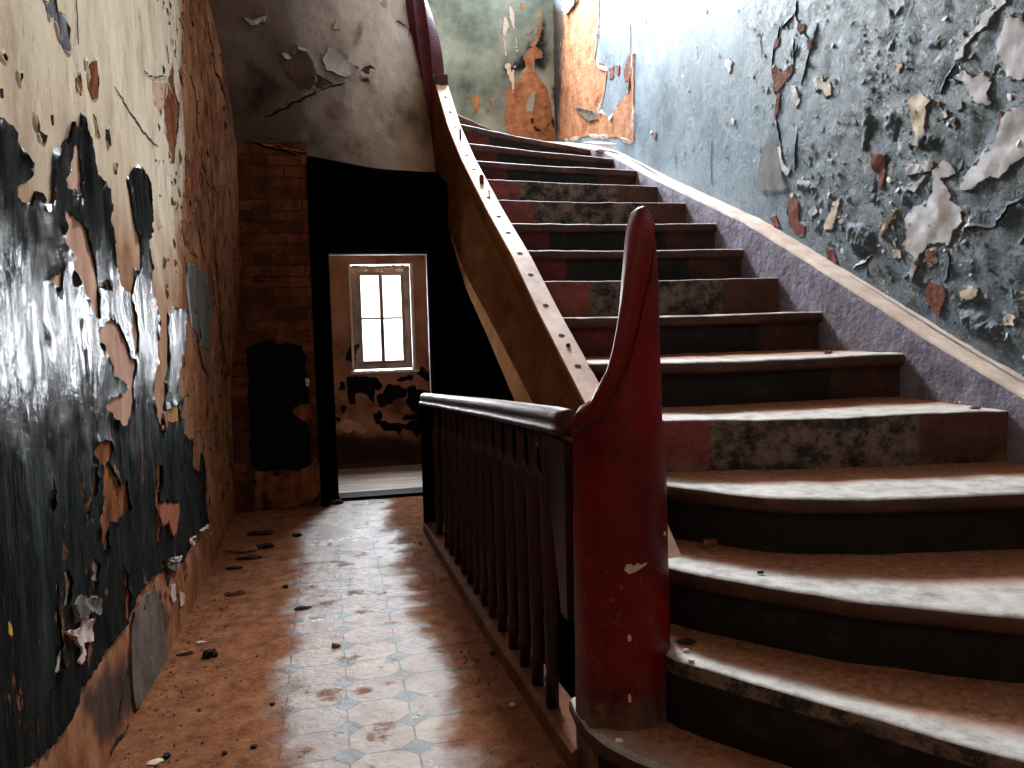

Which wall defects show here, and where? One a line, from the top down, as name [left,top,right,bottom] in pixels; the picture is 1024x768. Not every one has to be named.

crack [265,81,345,117]
flaking render [278,41,376,93]
flaking render [470,0,648,151]
crack [115,0,229,376]
flaking render [744,0,1024,359]
peeling [0,0,235,768]
peeling [335,366,430,437]
peeling [624,562,647,574]